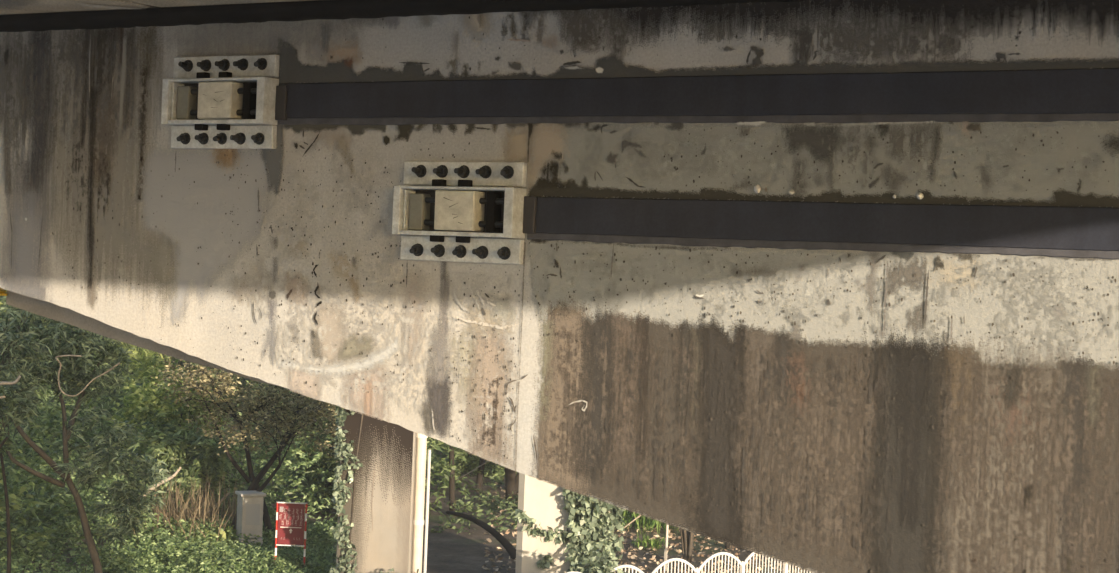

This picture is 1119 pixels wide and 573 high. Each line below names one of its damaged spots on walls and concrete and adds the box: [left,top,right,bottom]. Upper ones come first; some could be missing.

water stain [0,16,400,338]
water stain [447,0,1119,78]
water stain [225,237,521,573]
water stain [529,251,1119,573]